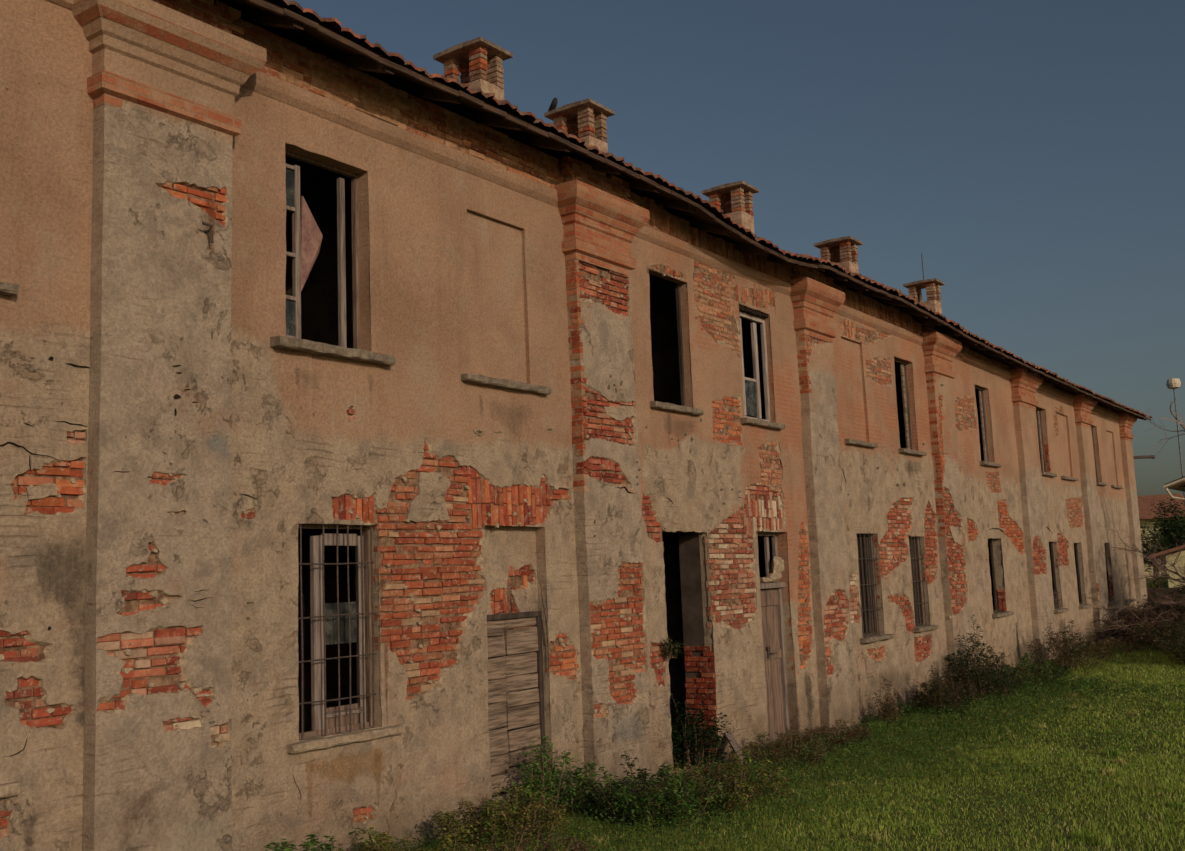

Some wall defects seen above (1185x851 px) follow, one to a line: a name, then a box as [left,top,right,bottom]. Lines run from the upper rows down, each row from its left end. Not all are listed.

spalling [156,181,228,229]
crack [0,418,89,470]
spalling [11,430,87,516]
spalling [117,539,183,616]
spalling [331,437,573,701]
spalling [582,374,648,446]
spalling [584,455,666,544]
spalling [699,395,861,678]
spalling [874,384,980,667]
spalling [0,626,78,730]
spalling [97,625,231,749]
spalling [545,562,666,718]